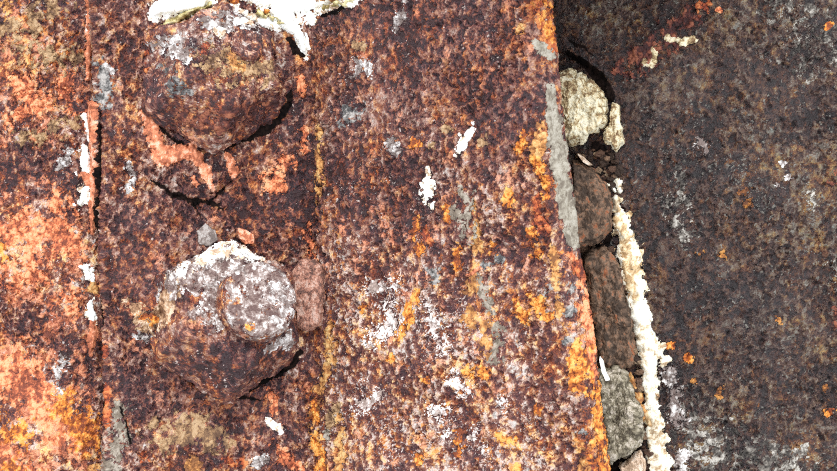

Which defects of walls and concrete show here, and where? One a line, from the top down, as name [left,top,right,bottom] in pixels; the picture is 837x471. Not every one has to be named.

damp [182,0,284,39]
damp [315,0,353,11]
rust [529,0,558,53]
damp [146,31,197,108]
rust [0,0,100,325]
rust [138,109,215,192]
rust [256,121,326,206]
rust [120,262,187,344]
rust [509,120,611,471]
damp [612,196,650,311]
rust [250,221,348,471]
rust [0,335,102,471]